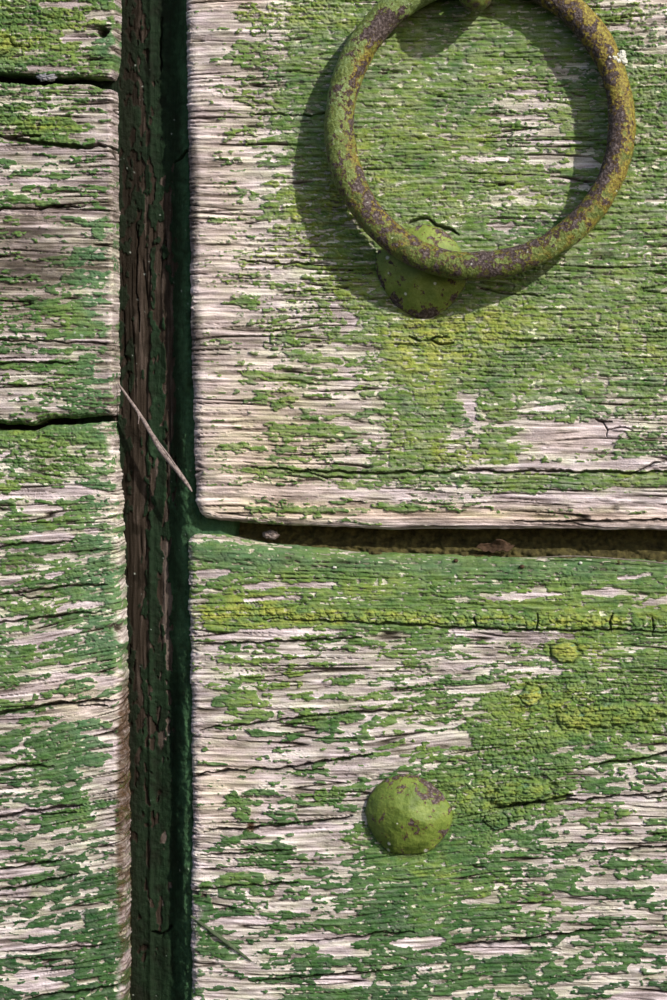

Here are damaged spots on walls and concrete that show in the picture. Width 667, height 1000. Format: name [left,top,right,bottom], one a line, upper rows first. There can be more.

peeling [23,84,115,122]
peeling [54,0,112,63]
peeling [0,144,116,410]
peeling [122,189,174,388]
peeling [189,0,667,529]
peeling [0,415,174,1000]
peeling [189,568,359,609]
peeling [190,624,369,852]
peeling [439,629,551,689]
peeling [465,565,567,610]
peeling [572,572,667,612]
peeling [191,745,667,1000]